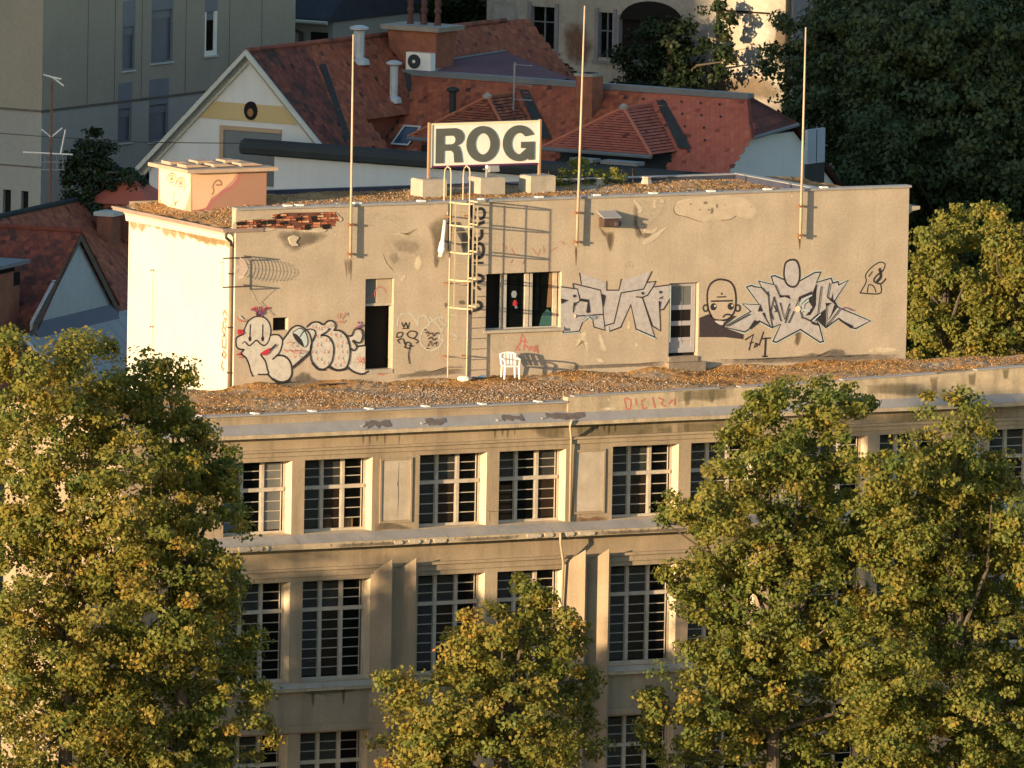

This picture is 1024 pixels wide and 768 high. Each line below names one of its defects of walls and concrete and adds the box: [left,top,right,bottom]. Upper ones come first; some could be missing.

flaking render [232,212,342,236]